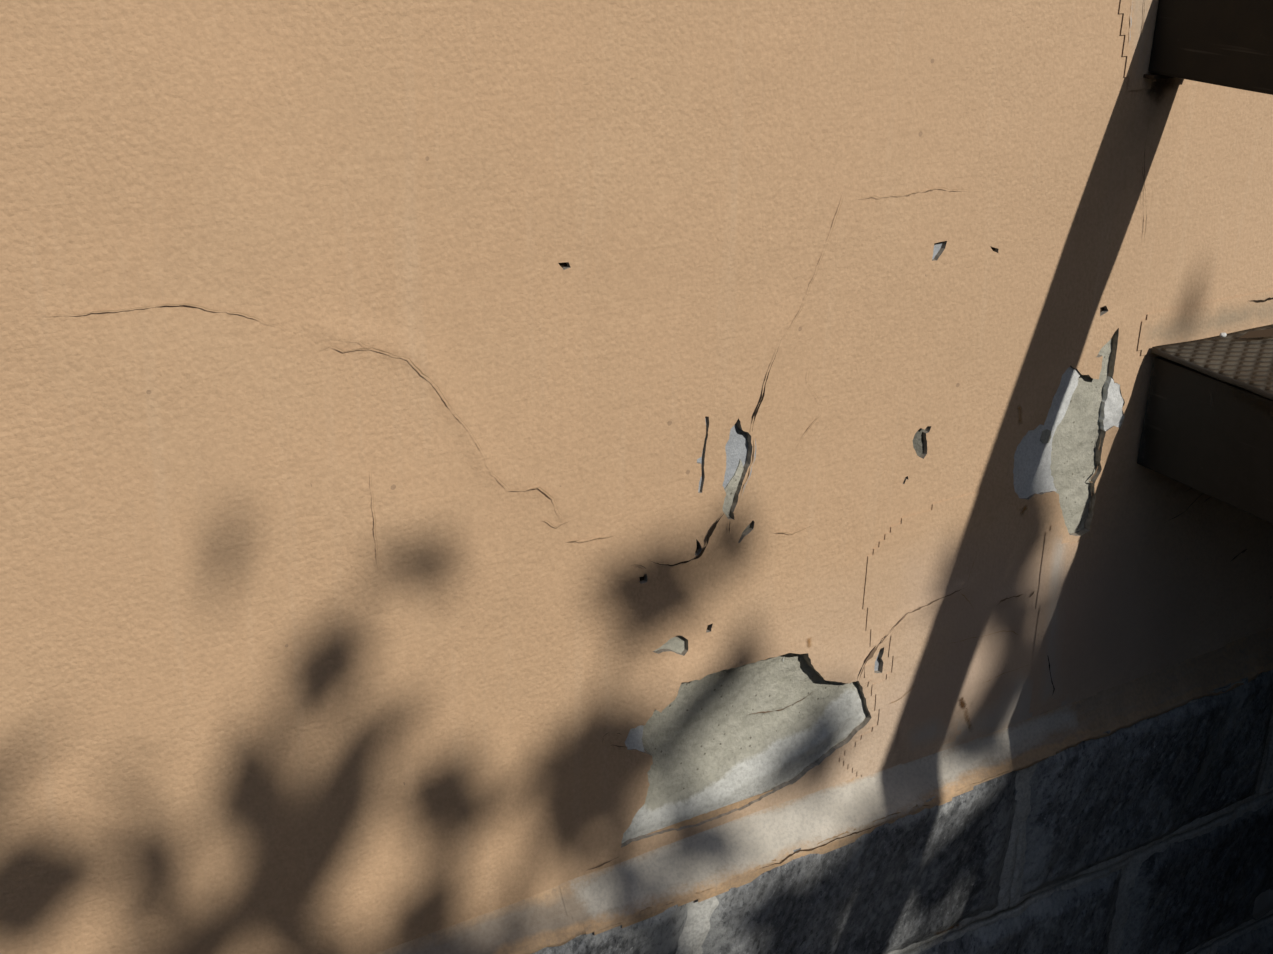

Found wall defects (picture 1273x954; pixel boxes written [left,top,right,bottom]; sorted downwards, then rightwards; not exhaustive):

crack [752,184,973,432]
spalling [722,422,756,517]
peeling [913,428,926,457]
spalling [1013,336,1124,533]
crack [631,515,730,569]
peeling [655,635,685,653]
crack [859,557,1034,681]
peeling [559,653,1089,935]